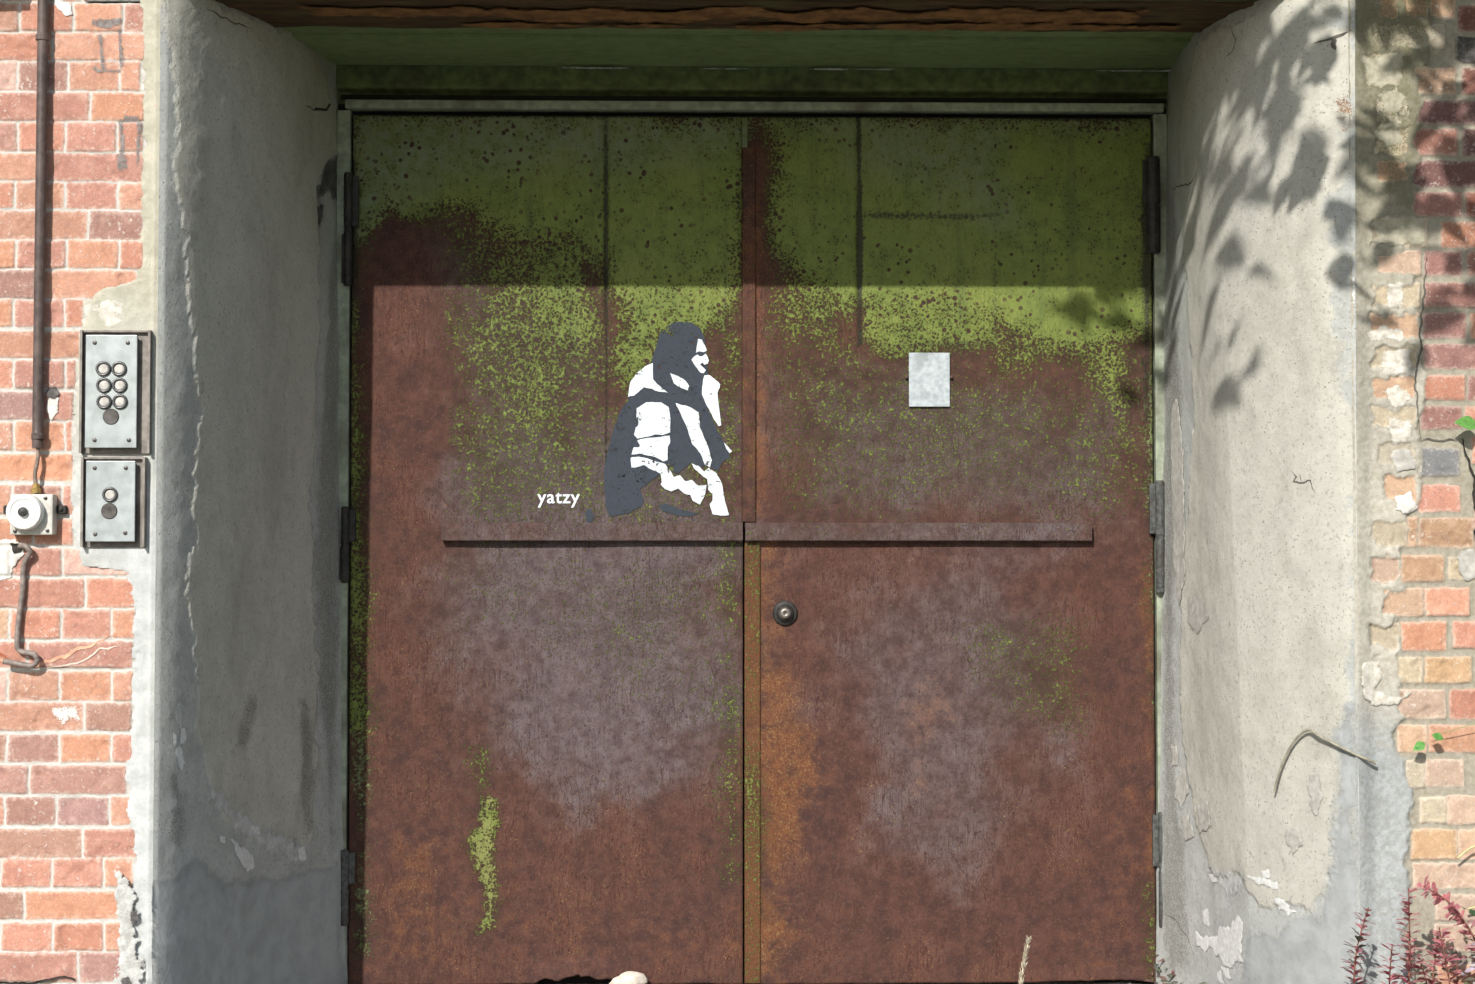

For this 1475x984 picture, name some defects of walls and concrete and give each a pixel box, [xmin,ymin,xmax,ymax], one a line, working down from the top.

crack [1414,252,1475,535]
crack [0,976,75,984]
spalling [112,870,145,984]
peeling [1195,866,1297,984]